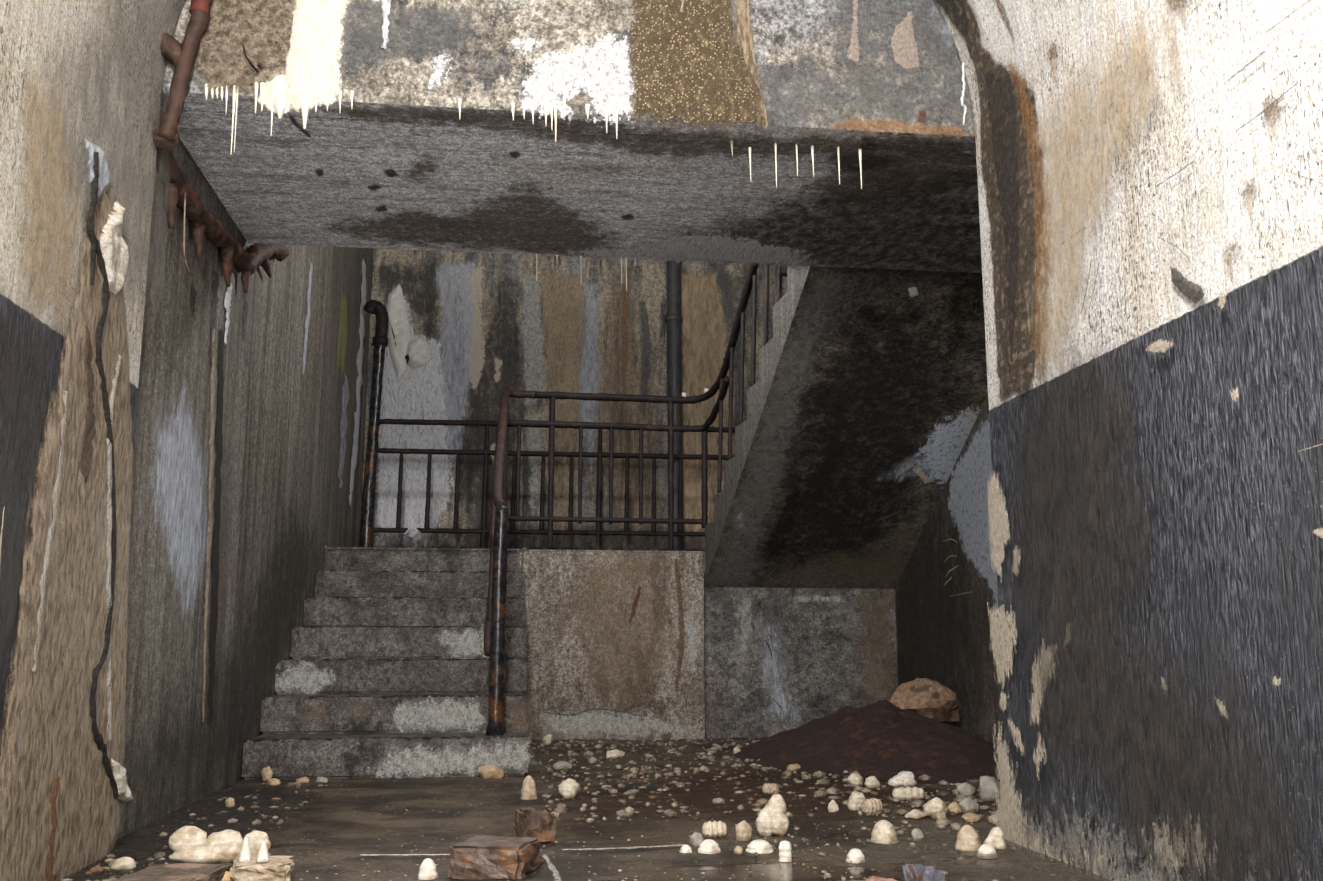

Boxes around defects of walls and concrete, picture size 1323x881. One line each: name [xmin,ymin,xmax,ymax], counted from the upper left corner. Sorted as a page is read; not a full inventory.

spalling [368,170,398,191]
spalling [847,0,863,61]
spalling [887,11,921,73]
rust [1008,63,1052,378]
rust [1047,43,1057,82]
crack [87,152,133,803]
damp [258,0,1301,881]
peeling [896,405,1218,881]